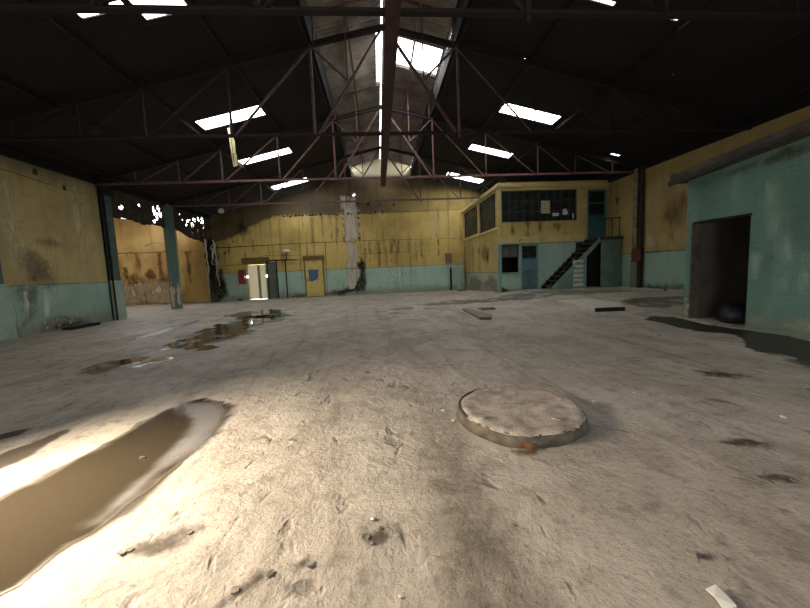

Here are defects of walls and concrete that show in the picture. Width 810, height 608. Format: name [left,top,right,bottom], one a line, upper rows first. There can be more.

peeling [340,192,365,293]
peeling [123,280,184,308]